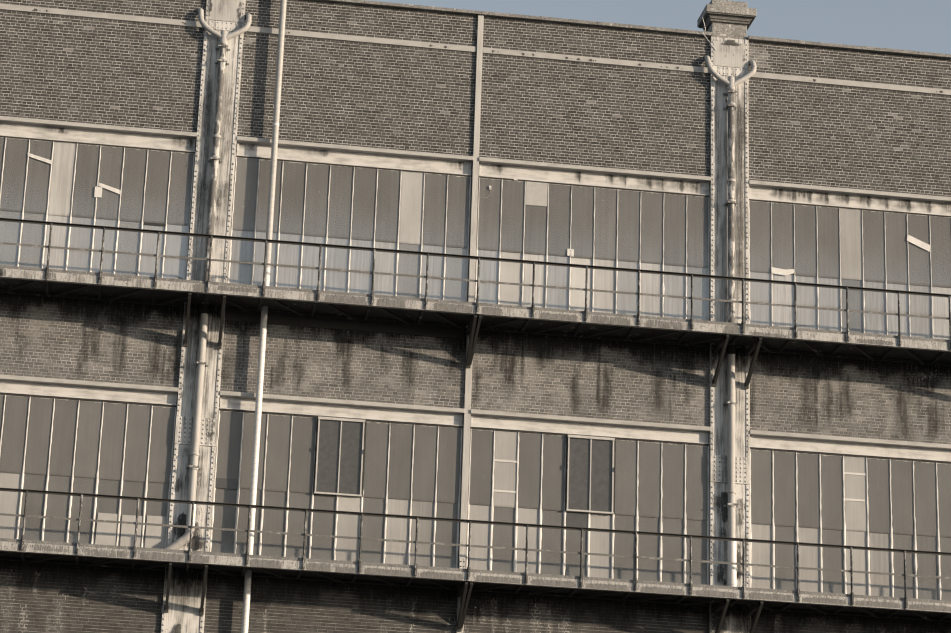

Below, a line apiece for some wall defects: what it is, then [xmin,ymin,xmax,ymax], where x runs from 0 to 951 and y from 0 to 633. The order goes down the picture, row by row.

leakage [597,367,609,407]
leakage [530,604,571,633]